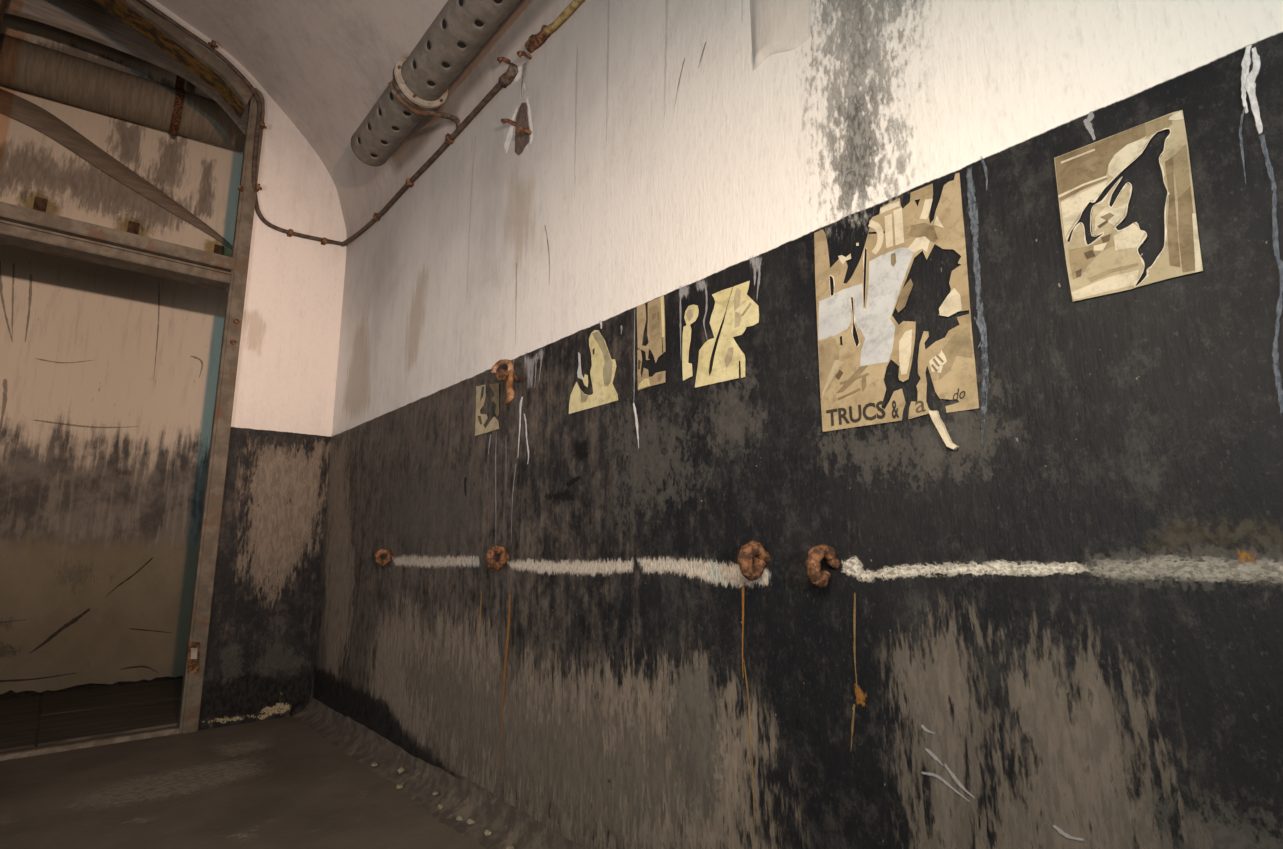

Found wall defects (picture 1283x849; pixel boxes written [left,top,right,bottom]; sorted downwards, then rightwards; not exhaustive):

flaking render [504,61,534,155]
damp [806,0,916,224]
damp [201,666,453,776]
rust [501,593,511,765]
rust [742,587,755,849]
rust [851,593,867,749]